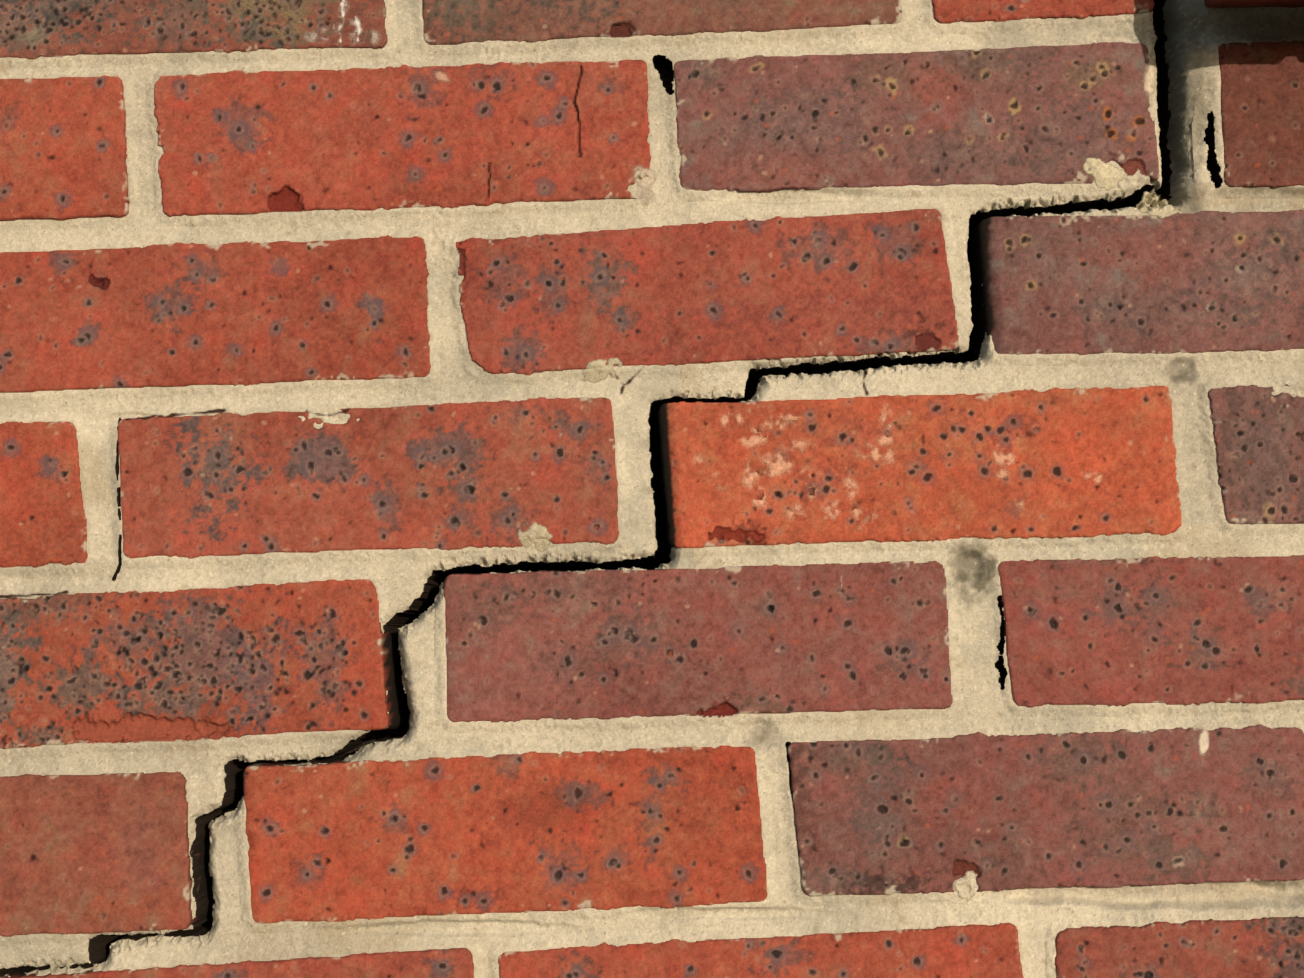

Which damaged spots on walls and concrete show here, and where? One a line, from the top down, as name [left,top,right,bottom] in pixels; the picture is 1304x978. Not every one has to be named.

crack [573,66,582,157]
crack [968,0,1173,239]
crack [0,284,985,977]